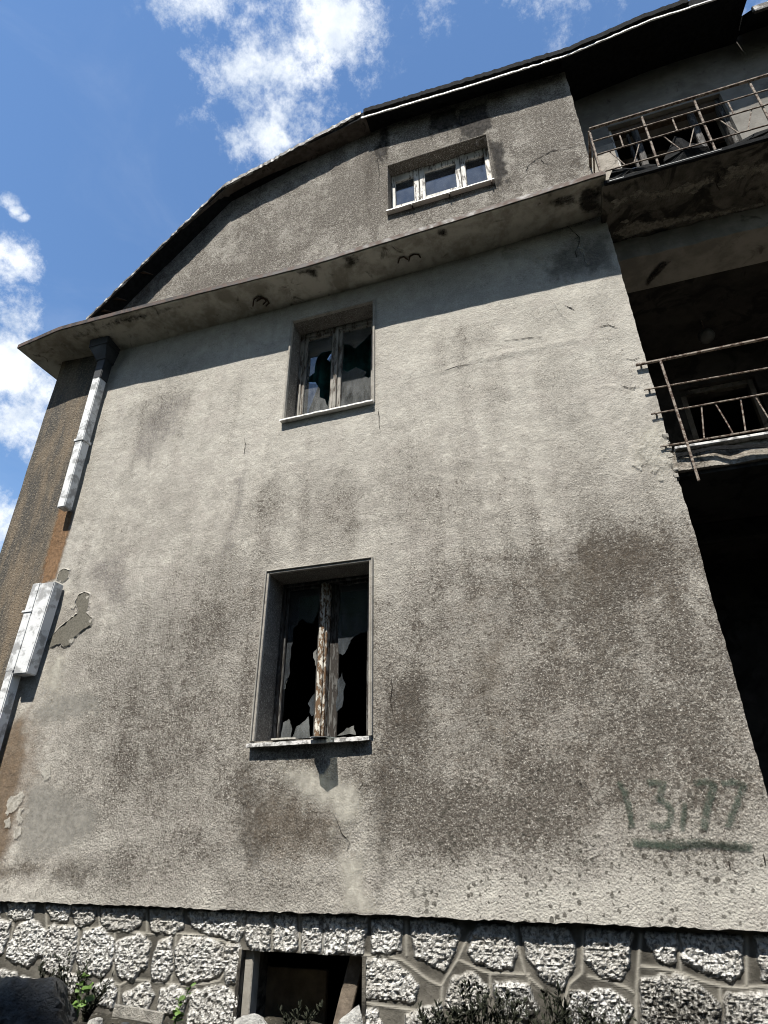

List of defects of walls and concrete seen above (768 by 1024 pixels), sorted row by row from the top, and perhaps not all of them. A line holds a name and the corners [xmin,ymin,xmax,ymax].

leakage [553,188,601,213]
spalling [47,591,94,690]
peeling [4,765,94,851]